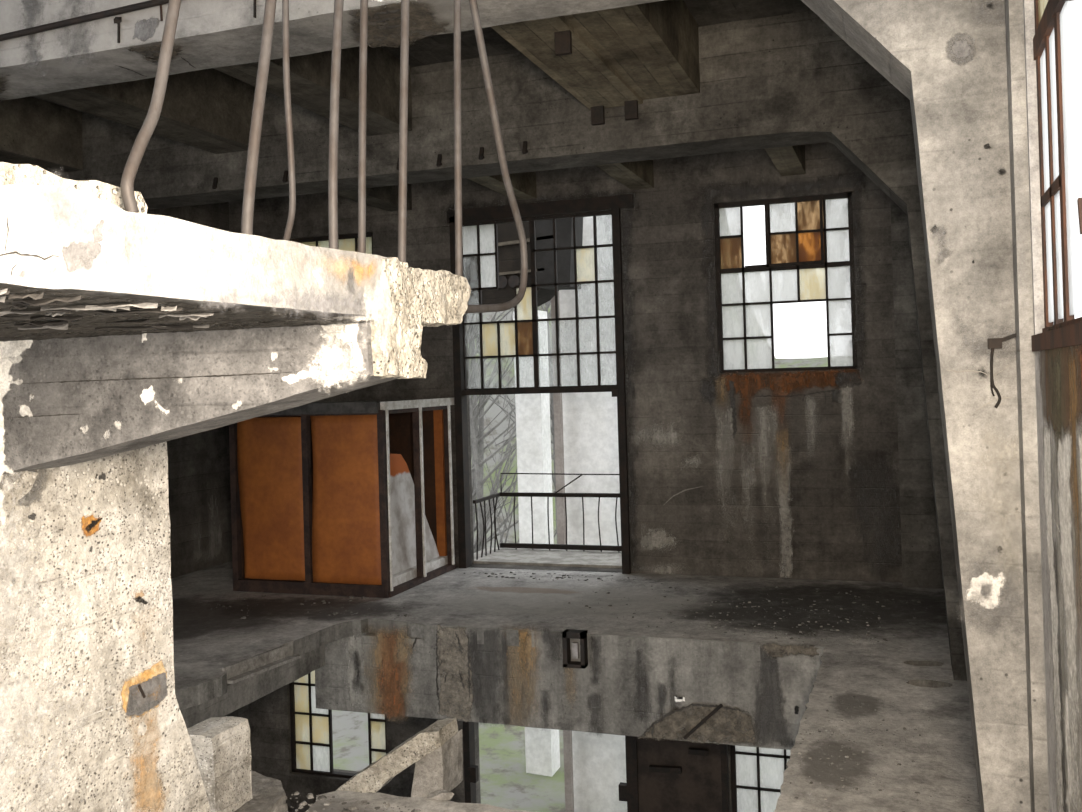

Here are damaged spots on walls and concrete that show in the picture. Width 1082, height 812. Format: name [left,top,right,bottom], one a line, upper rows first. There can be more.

crack [0,216,59,275]
corrosion [335,262,376,294]
peeling [19,396,33,417]
peeling [0,289,214,343]
peeling [140,385,169,415]
peeling [269,353,320,384]
peeling [321,316,367,372]
leakage [700,174,866,577]
corrosion [717,369,861,467]
corrosion [1040,345,1082,580]
leakage [1043,428,1082,812]
corrosion [347,632,412,717]